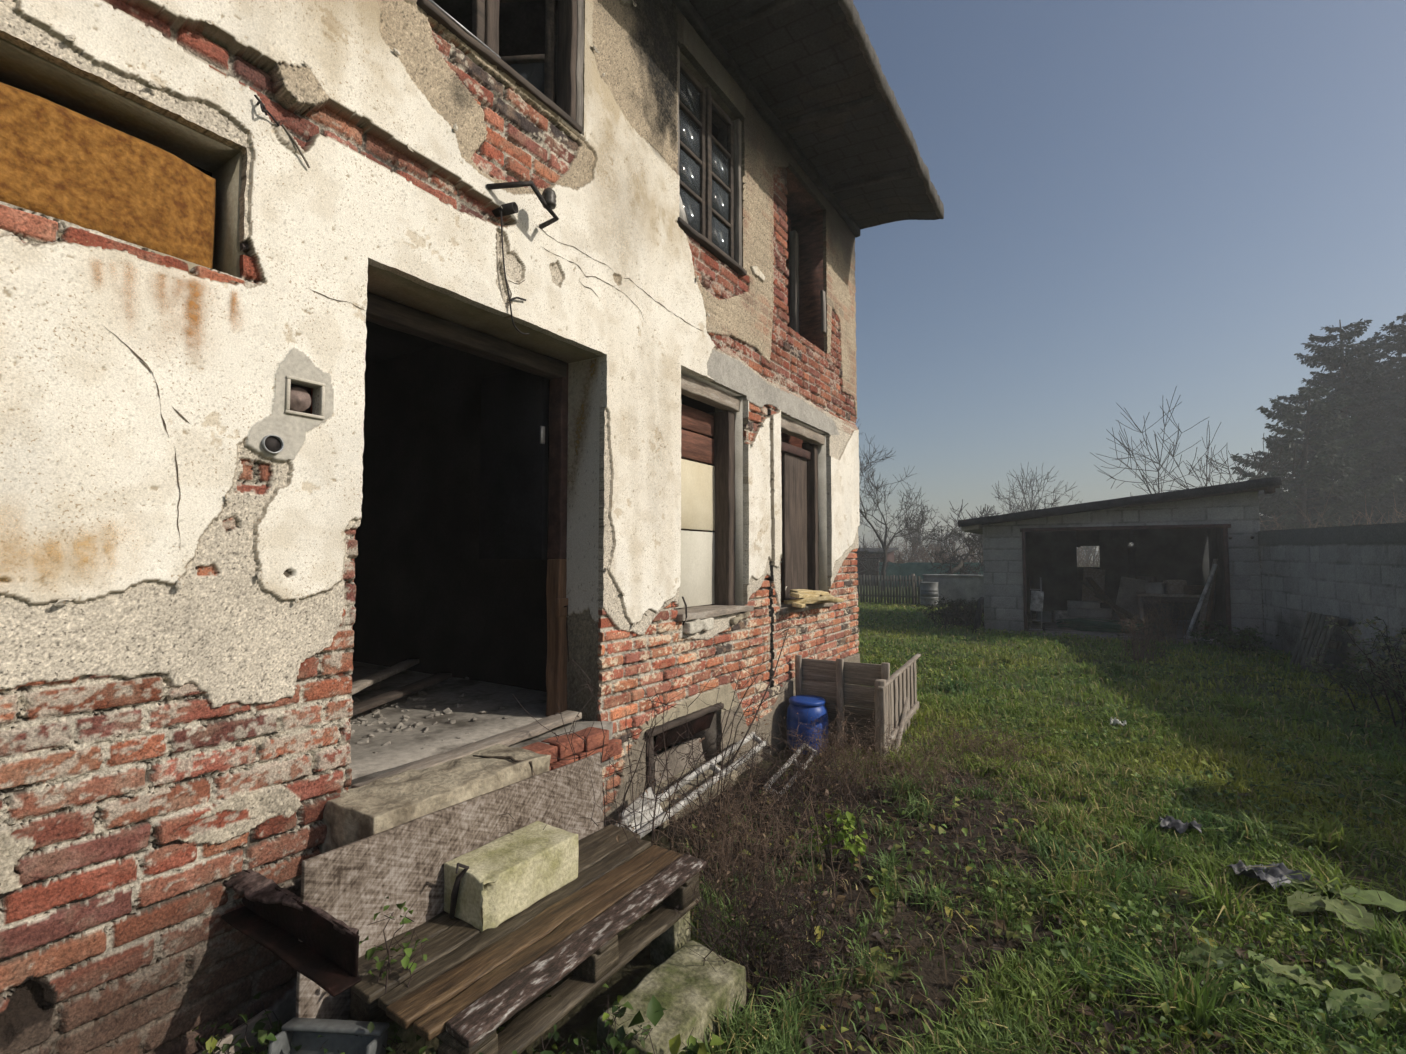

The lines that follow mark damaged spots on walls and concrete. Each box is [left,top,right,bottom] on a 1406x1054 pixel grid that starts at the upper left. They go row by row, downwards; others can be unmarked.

peeling [0,443,361,1054]